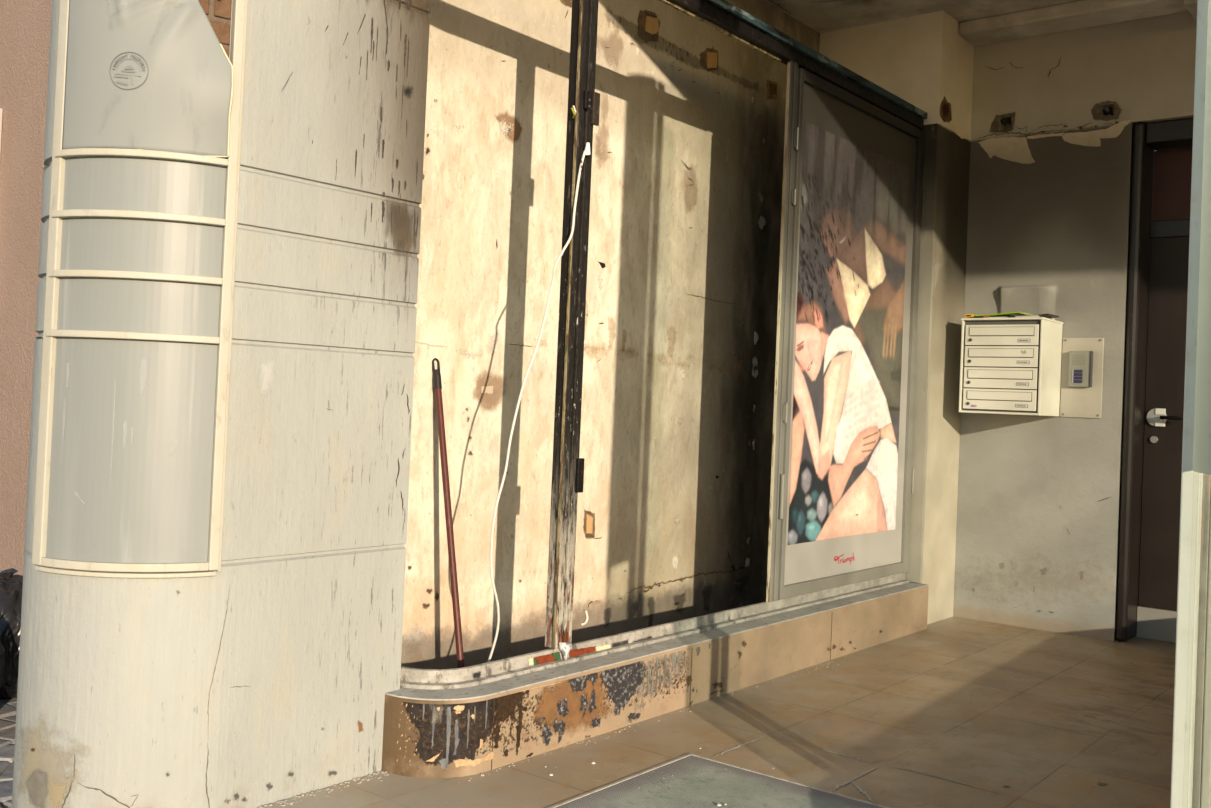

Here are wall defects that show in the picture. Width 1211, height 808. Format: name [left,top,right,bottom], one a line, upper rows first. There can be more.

flaking render [199,0,232,58]
peeling [940,96,1131,164]
leakage [571,575,755,644]
leakage [401,621,551,669]
crack [206,589,230,808]
peeling [397,703,494,767]
crack [62,754,138,808]